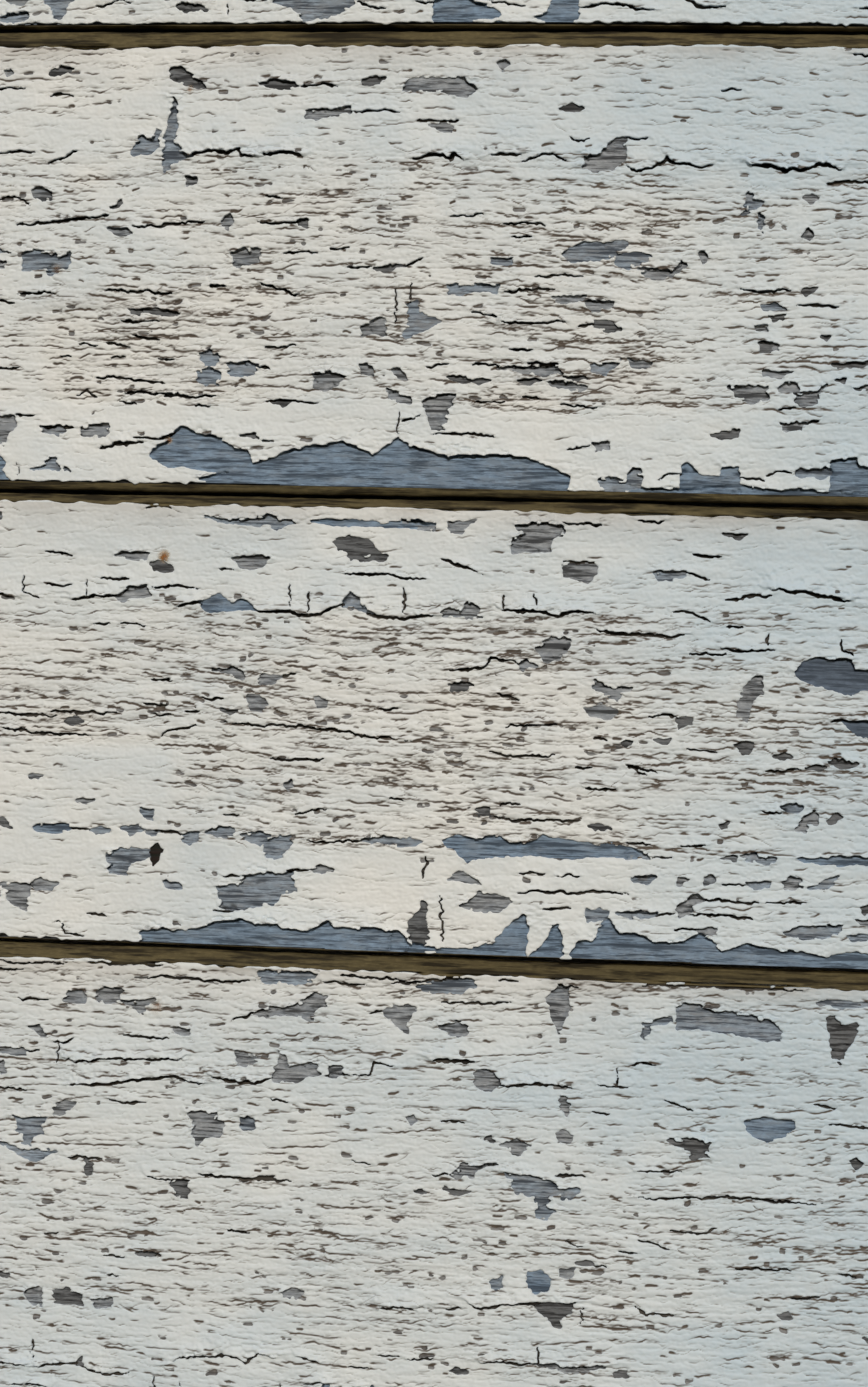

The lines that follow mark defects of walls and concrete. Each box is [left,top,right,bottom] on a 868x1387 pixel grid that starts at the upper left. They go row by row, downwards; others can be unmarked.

peeling [130,66,208,187]
peeling [256,75,400,121]
peeling [727,302,868,433]
peeling [149,356,653,491]
peeling [598,449,868,497]
crack [0,546,198,598]
peeling [55,544,483,621]
peeling [204,510,477,562]
crack [93,619,147,627]
peeling [795,646,868,696]
peeling [33,802,868,969]
peeling [414,1135,585,1221]